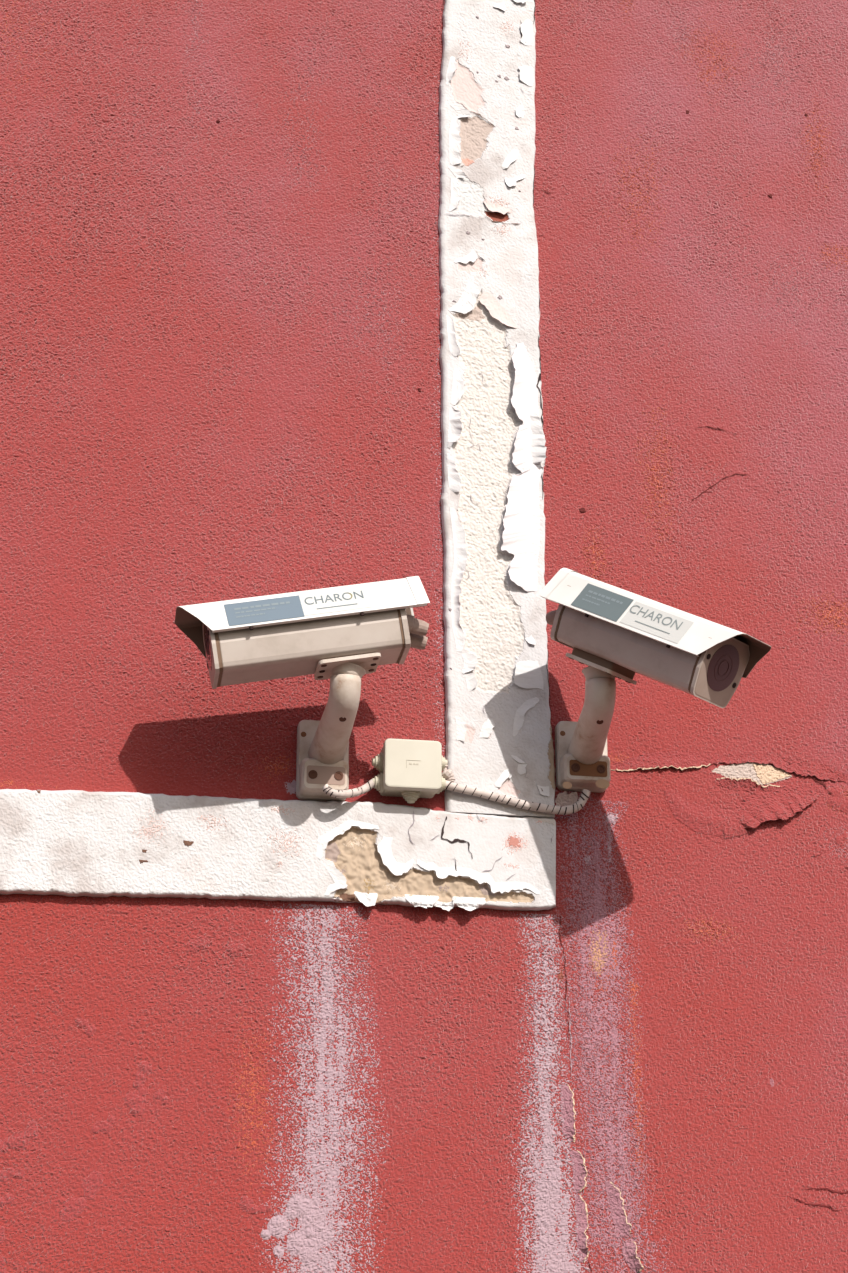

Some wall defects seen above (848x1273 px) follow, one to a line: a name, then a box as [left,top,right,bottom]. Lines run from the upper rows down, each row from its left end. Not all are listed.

peeling [505,19,533,48]
peeling [446,56,533,223]
peeling [446,231,546,736]
peeling [455,716,495,744]
peeling [494,755,550,798]
flaking render [610,751,848,793]
spalling [316,820,540,911]
crack [408,807,515,880]